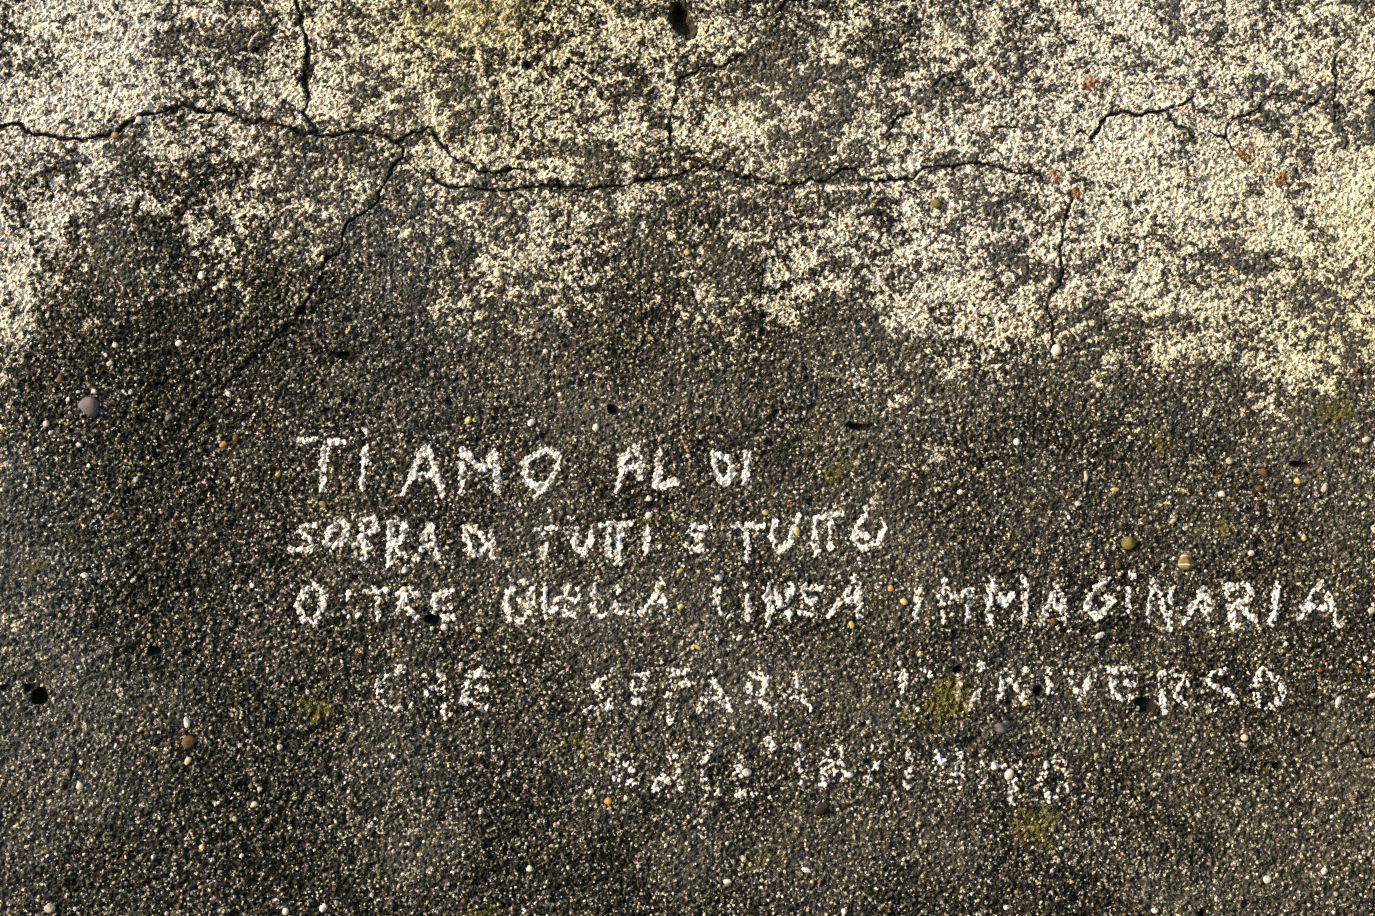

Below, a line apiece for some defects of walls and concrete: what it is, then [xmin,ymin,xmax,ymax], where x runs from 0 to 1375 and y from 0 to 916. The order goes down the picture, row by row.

crack [0,0,1074,469]
crack [1077,55,1338,164]